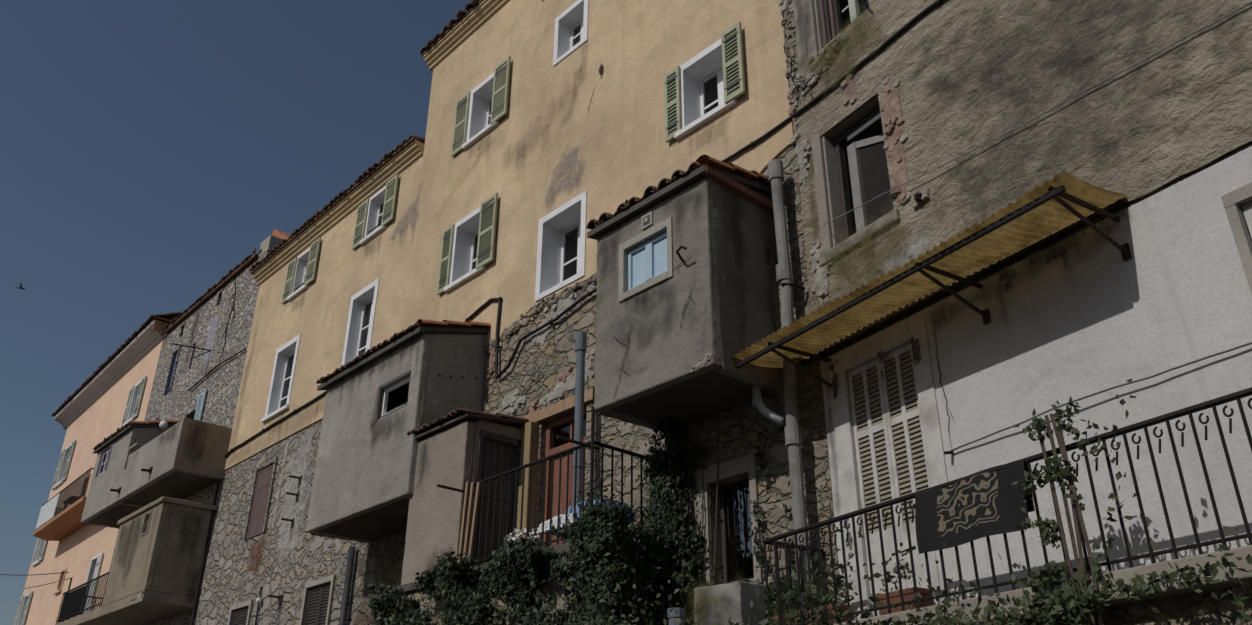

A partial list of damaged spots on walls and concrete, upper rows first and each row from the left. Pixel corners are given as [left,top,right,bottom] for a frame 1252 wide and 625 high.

flaking render [880,76,930,208]